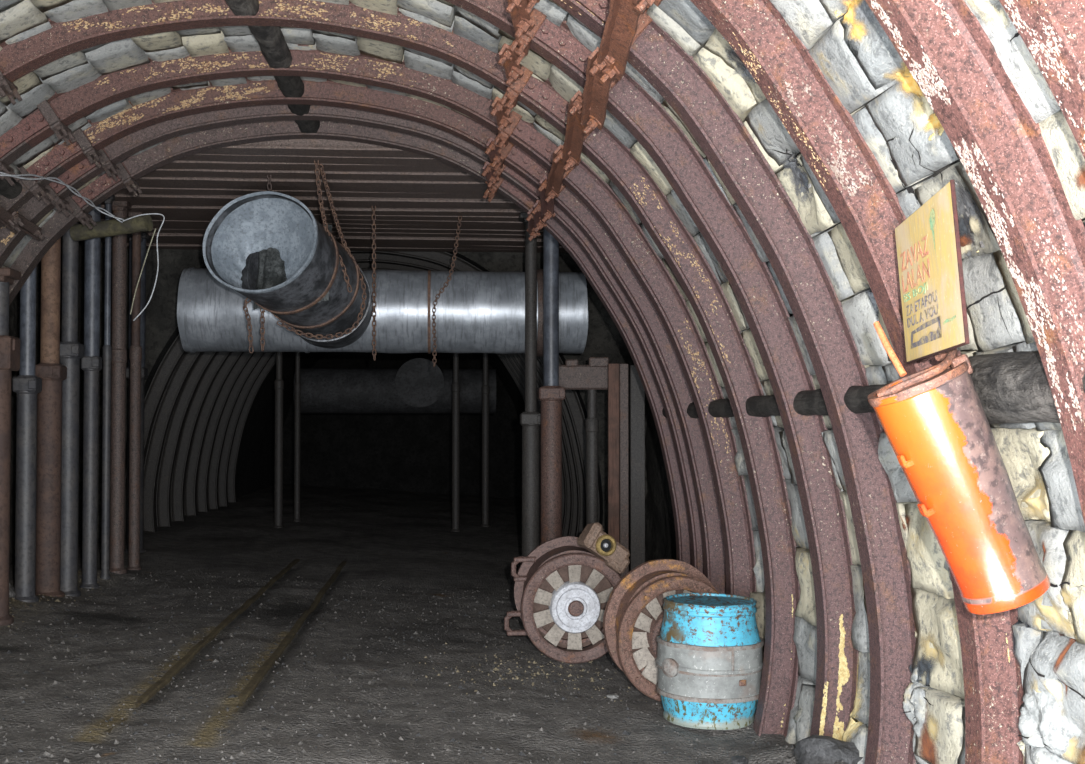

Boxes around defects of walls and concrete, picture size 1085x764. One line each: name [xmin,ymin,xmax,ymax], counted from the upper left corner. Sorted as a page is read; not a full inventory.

corrosion [1075,168,1085,187]